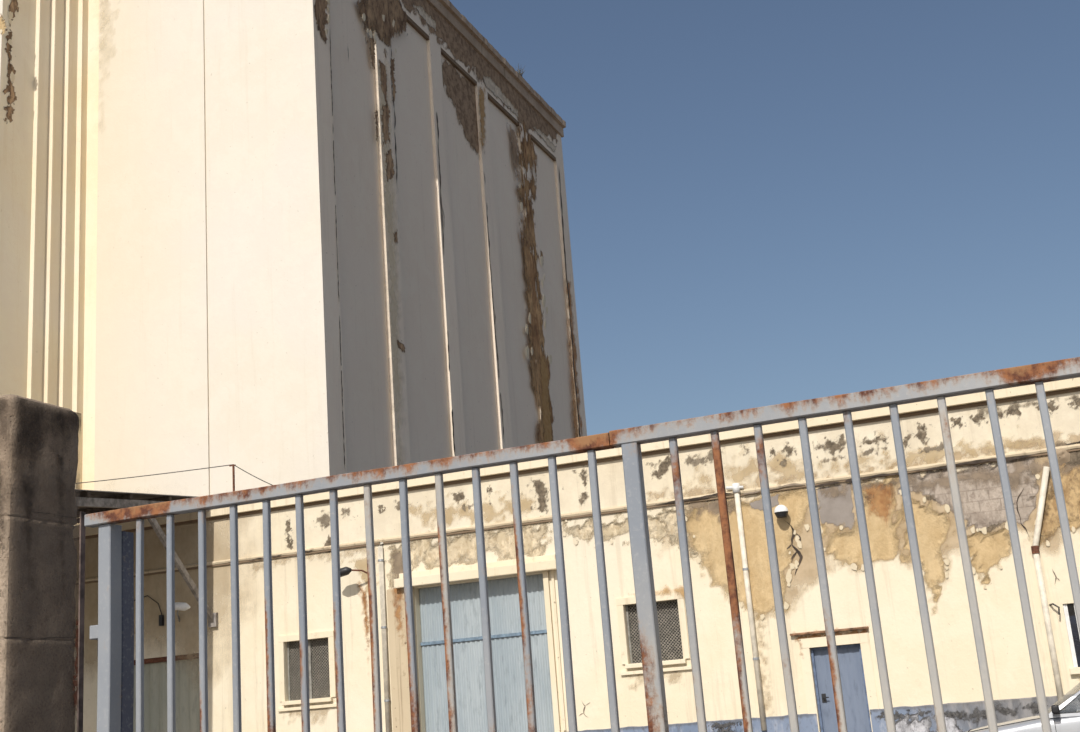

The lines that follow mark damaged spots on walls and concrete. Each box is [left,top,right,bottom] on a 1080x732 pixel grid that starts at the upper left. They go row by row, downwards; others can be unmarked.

spalling [0,0,19,123]
spalling [314,0,330,42]
peeling [356,0,408,182]
peeling [442,60,485,154]
spalling [510,121,554,443]
water stain [12,398,82,471]
water stain [0,481,98,732]
water stain [132,523,231,658]
peeling [388,512,629,589]
crack [784,520,803,573]
peeling [647,443,1080,620]
peeling [895,709,966,732]